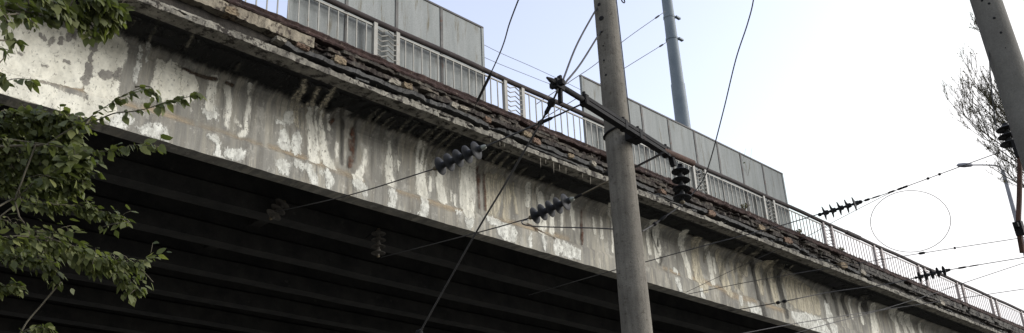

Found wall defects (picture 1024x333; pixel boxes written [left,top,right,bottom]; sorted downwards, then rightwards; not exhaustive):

water stain [64,32,99,92]
efflorescence [205,74,253,138]
spalling [330,55,347,66]
spalling [385,78,413,90]
spalling [448,102,470,113]
water stain [272,79,575,238]
spalling [520,131,541,145]
water stain [592,203,614,253]
water stain [646,219,793,319]
peeling [739,294,762,315]
peeling [782,273,838,333]
water stain [824,289,922,333]